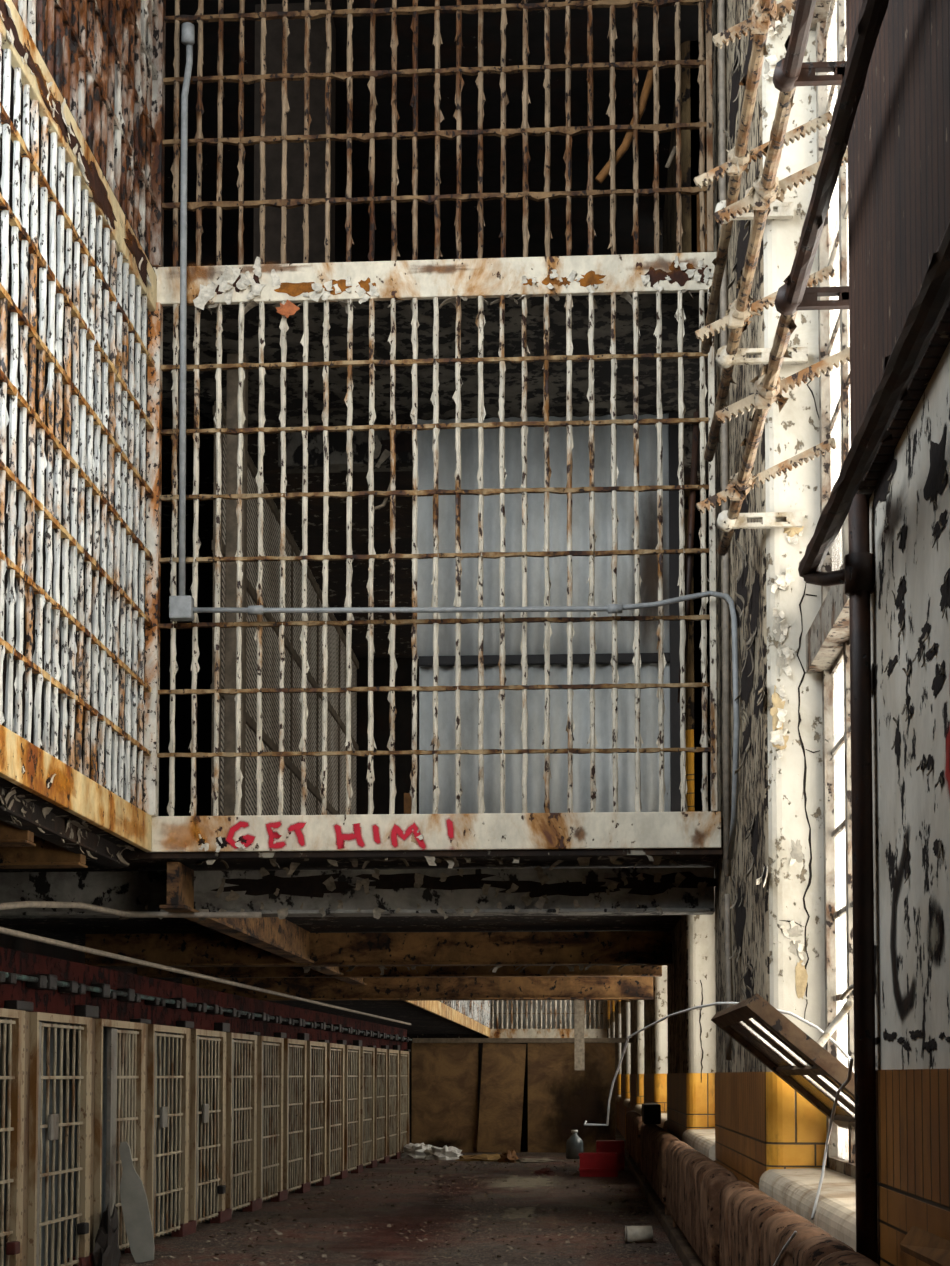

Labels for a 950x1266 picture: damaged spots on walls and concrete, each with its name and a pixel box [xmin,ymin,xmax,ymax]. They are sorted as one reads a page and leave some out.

peeling [439,269,606,309]
peeling [872,448,907,553]
peeling [923,424,947,548]
peeling [871,568,950,698]
peeling [891,693,914,767]
peeling [916,754,944,789]
peeling [0,790,134,865]
peeling [196,830,717,920]
peeling [729,811,768,1001]
flaking render [789,839,803,866]
peeling [932,838,943,858]
flaking render [780,919,808,1000]